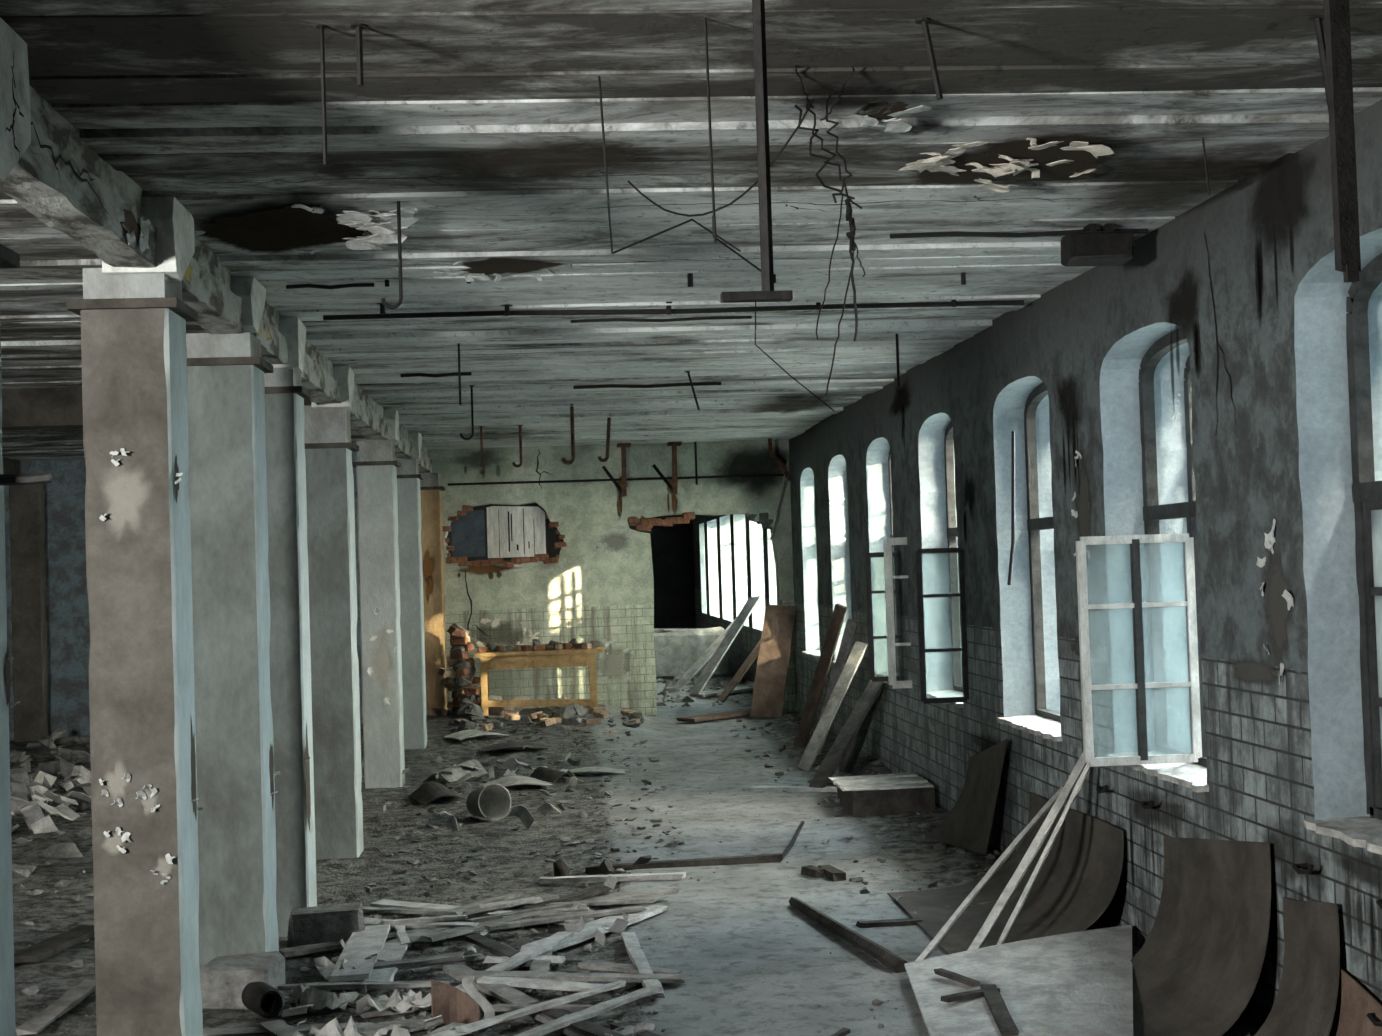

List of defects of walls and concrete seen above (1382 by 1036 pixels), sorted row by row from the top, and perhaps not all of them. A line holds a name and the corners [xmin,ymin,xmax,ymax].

peeling [898,138,1114,193]
peeling [291,204,419,250]
rust [617,476,627,517]
rust [667,479,677,513]
spalling [443,505,567,567]